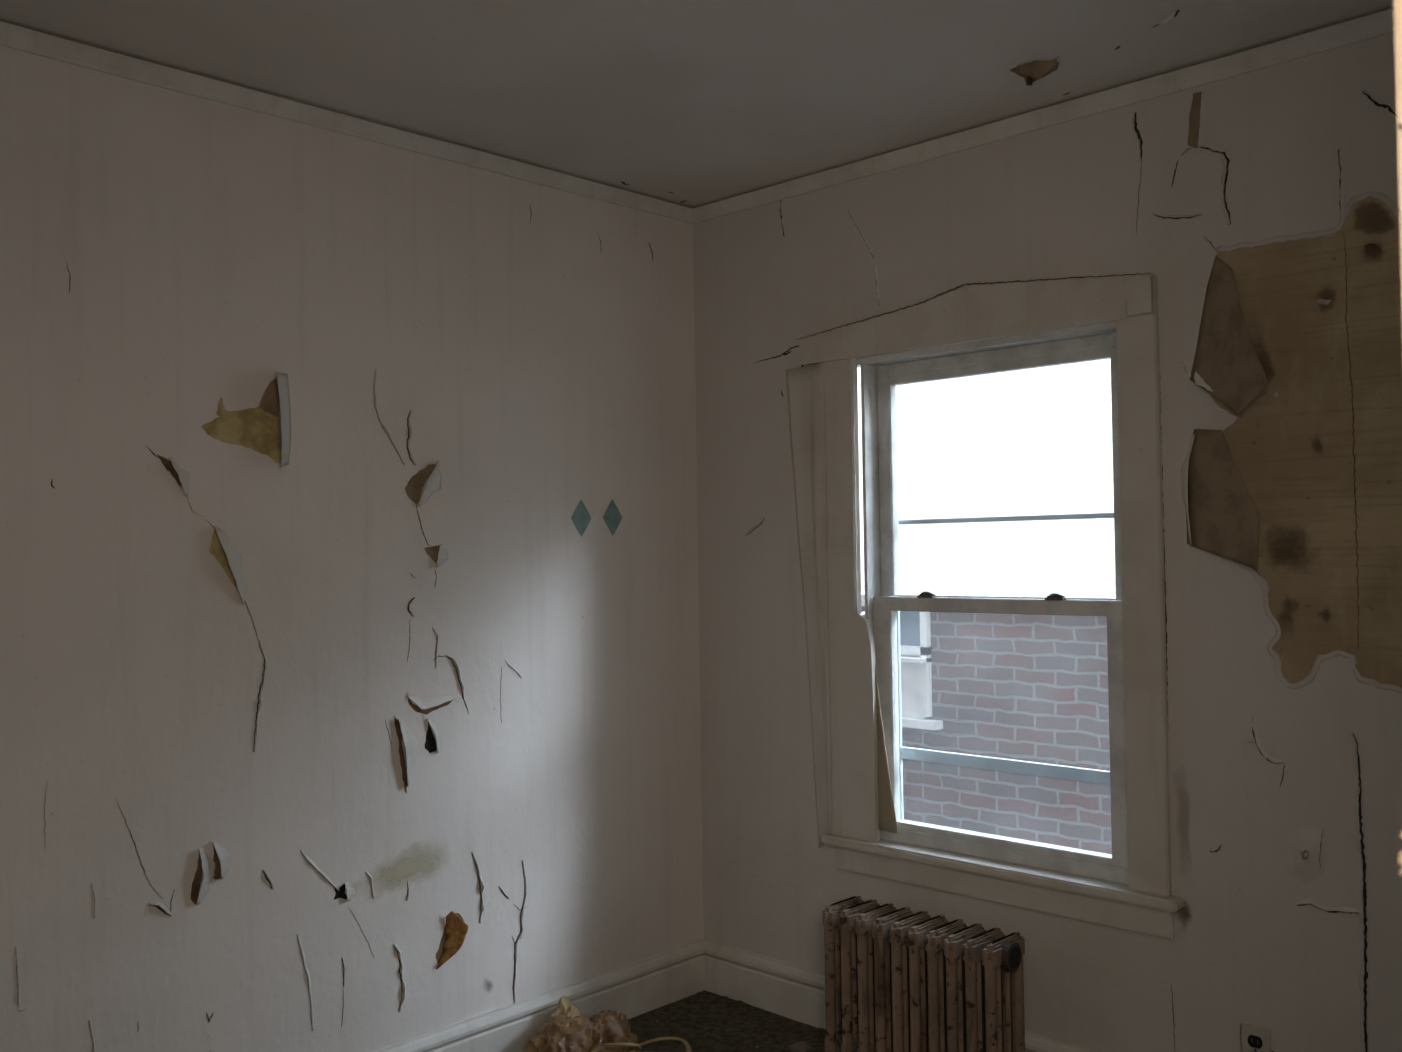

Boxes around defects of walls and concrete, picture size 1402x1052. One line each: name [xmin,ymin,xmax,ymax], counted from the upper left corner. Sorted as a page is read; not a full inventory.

peeling [1009,58,1060,86]
crack [1132,113,1231,250]
crack [756,273,1147,397]
crack [472,852,527,1003]
crack [1296,733,1368,1052]